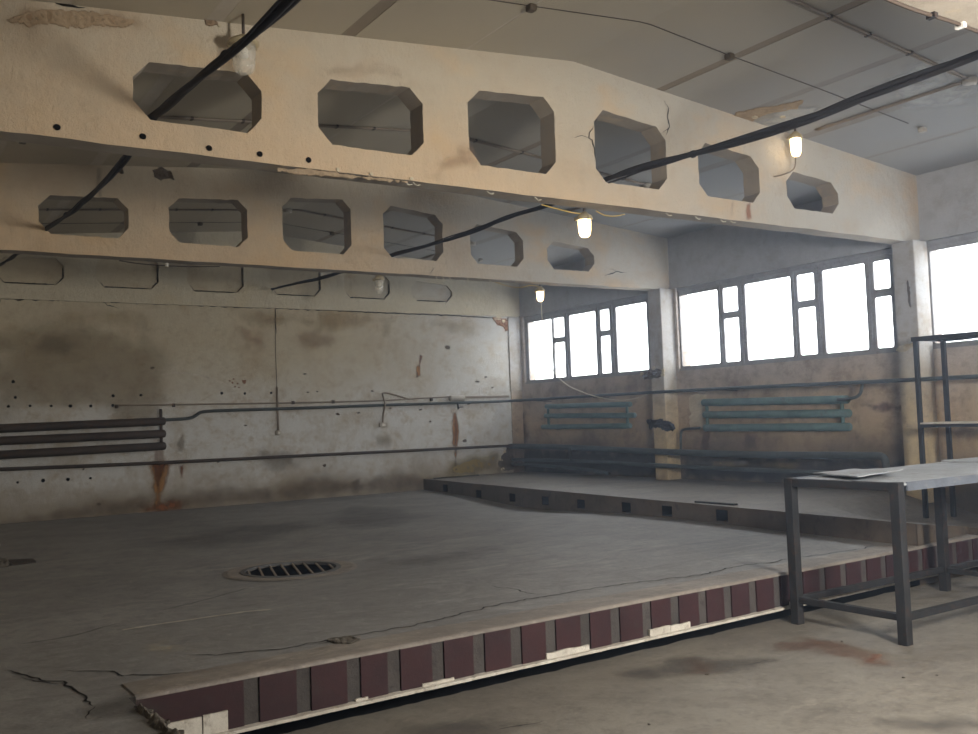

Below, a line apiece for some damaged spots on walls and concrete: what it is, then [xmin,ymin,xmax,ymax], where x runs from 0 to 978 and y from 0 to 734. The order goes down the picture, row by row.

flaking render [7,9,135,29]
peeling [734,100,804,122]
corrosion [146,464,183,511]
crack [8,640,326,719]
spalling [134,703,184,734]